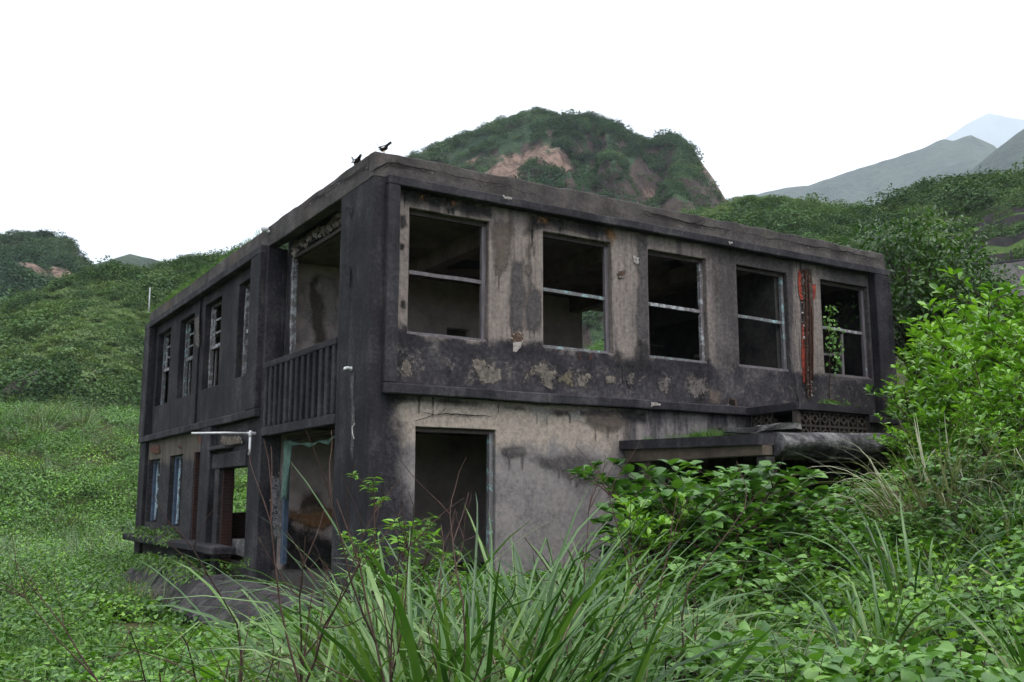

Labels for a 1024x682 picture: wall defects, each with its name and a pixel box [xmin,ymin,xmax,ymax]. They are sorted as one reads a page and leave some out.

water stain [400,190,606,338]
spalling [511,332,523,352]
rust [798,268,816,399]
peeling [472,358,503,385]
peeling [523,362,635,389]
peeling [687,377,708,398]
water stain [388,394,478,411]
water stain [498,403,647,441]
water stain [503,446,527,470]